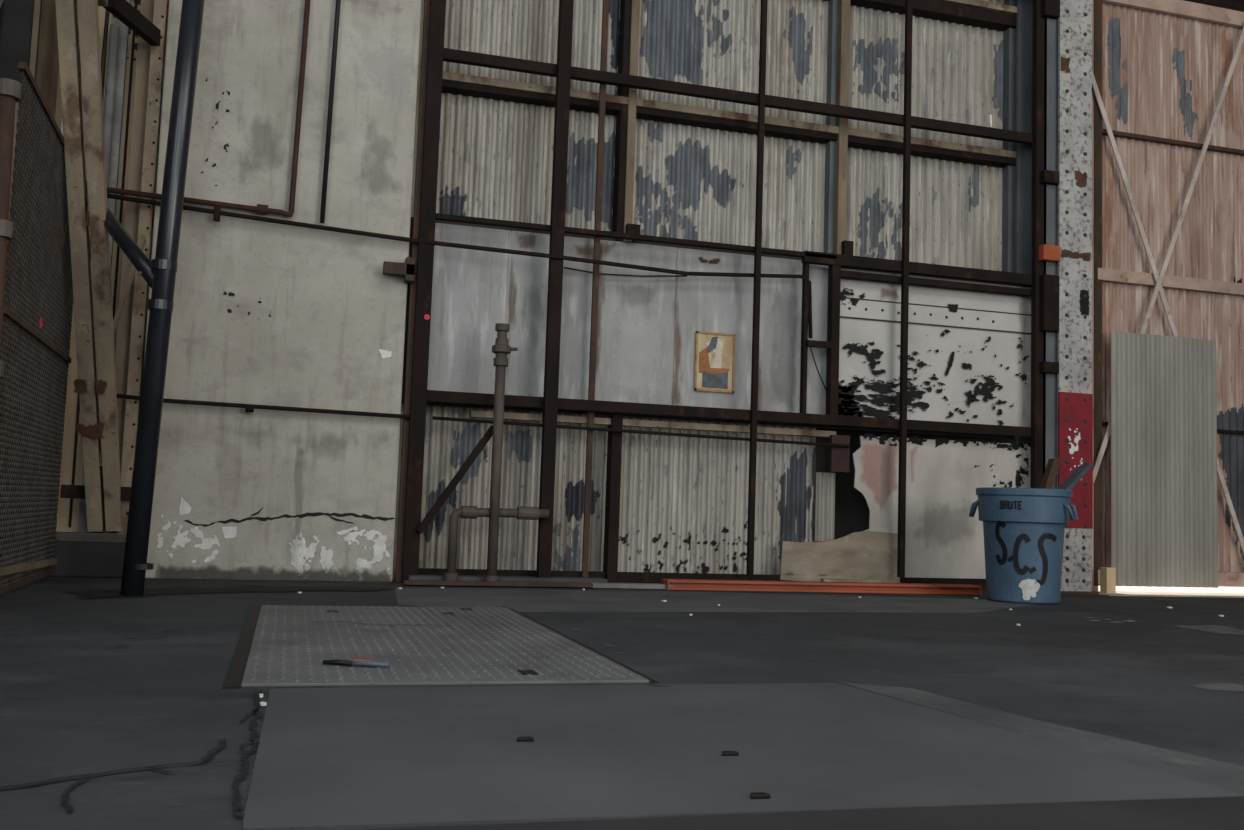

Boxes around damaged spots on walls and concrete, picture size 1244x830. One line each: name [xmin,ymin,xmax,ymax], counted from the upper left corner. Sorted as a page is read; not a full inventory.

peeling [840,287,865,306]
peeling [838,329,1029,425]
peeling [863,433,1031,451]
peeling [1068,428,1083,480]
peeling [156,497,237,563]
crack [184,508,395,527]
peeling [289,526,391,593]